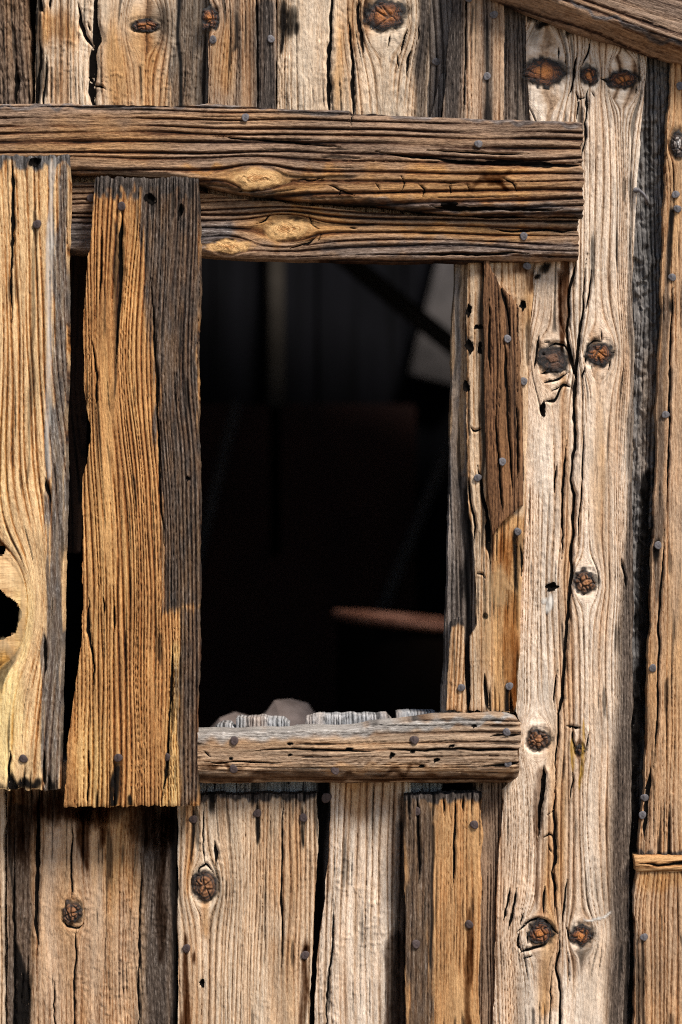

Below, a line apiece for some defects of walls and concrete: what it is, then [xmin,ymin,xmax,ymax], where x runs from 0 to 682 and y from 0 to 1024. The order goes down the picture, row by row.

crack [78,0,106,105]
crack [213,136,338,147]
crack [376,40,606,256]
crack [468,253,615,1024]
crack [326,910,334,1024]